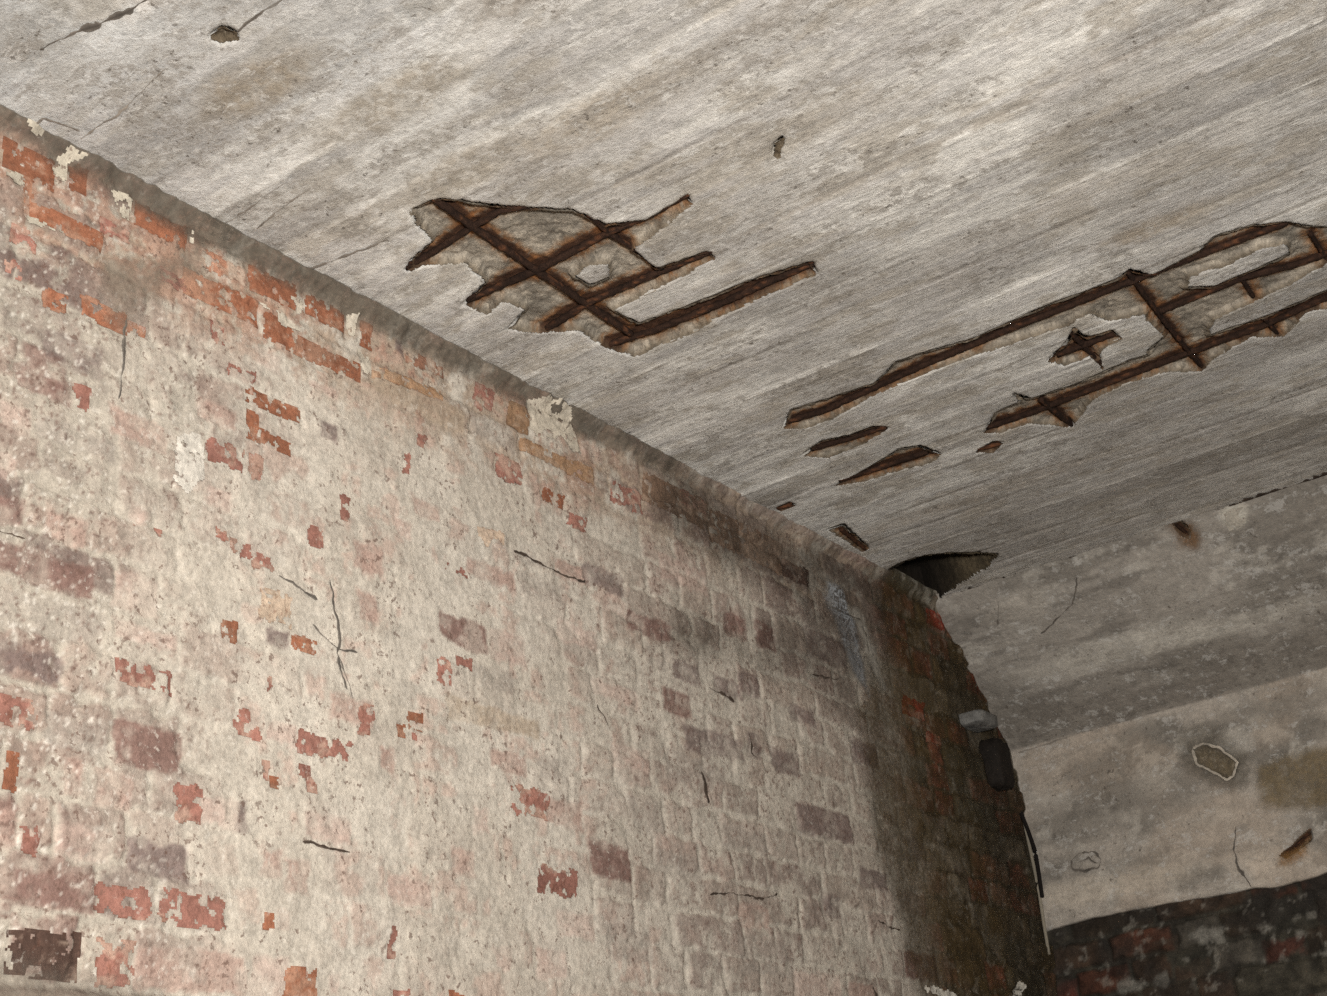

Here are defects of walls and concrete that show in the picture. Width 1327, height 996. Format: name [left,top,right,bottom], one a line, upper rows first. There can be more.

crack [40,0,147,50]
crack [237,0,282,32]
spalling [405,194,816,357]
spalling [783,221,1327,453]
spalling [804,426,888,458]
crack [279,575,358,698]
spalling [1192,742,1239,781]